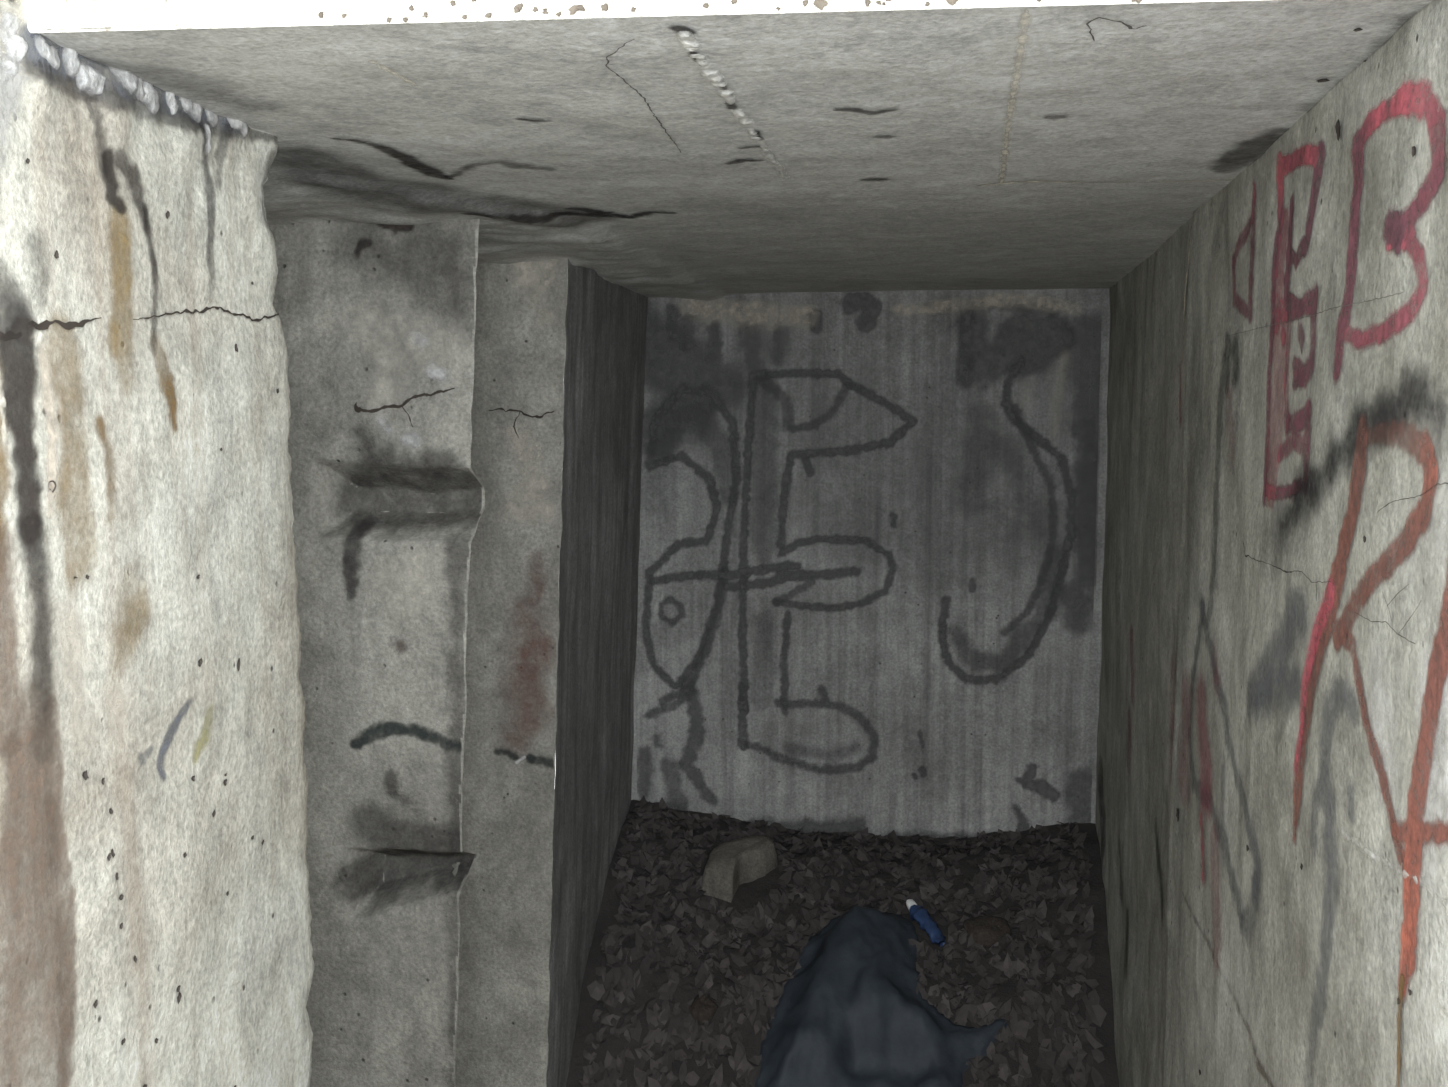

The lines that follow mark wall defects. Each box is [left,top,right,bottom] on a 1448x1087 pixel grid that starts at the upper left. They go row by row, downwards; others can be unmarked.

crack [332,138,553,179]
crack [462,212,619,224]
damp [0,285,16,333]
damp [40,353,57,495]
crack [354,388,455,427]
crack [488,408,554,438]
crack [0,306,279,686]
damp [343,443,482,597]
damp [0,552,75,1087]